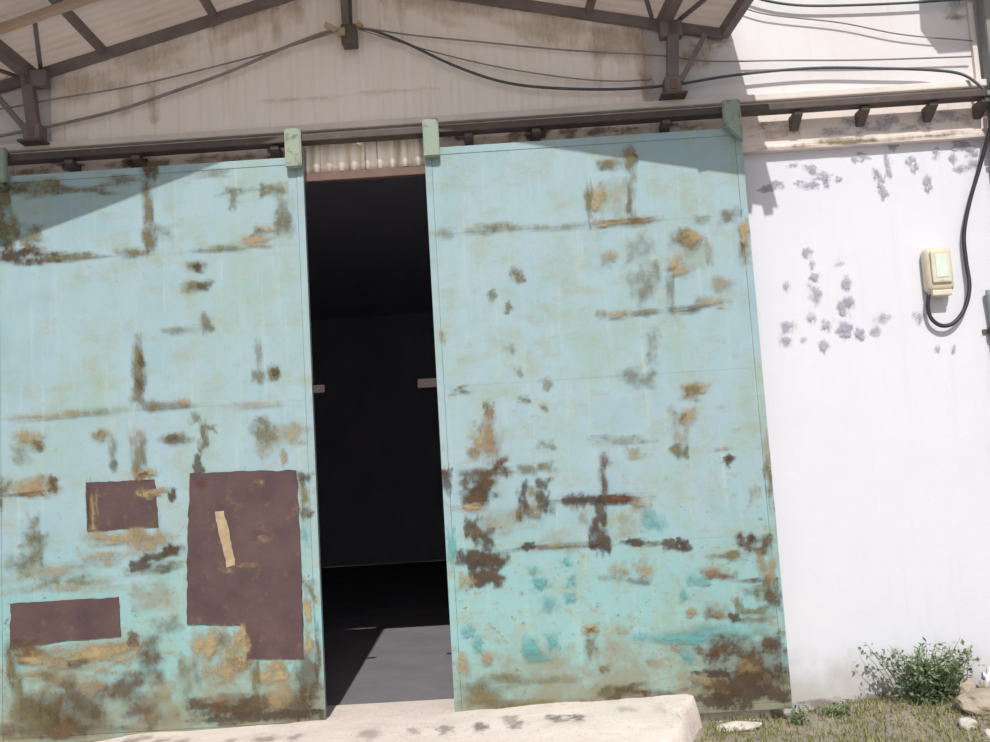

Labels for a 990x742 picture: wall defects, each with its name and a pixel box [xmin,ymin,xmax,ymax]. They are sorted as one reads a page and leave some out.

peeling [762,164,842,192]
peeling [874,144,899,200]
peeling [905,156,933,192]
peeling [949,141,978,172]
peeling [781,321,793,345]
peeling [809,273,891,351]
rust [442,404,510,587]
rust [516,453,652,554]
rust [626,537,693,551]
rust [708,533,780,622]
rust [186,581,324,726]
rust [691,631,791,710]